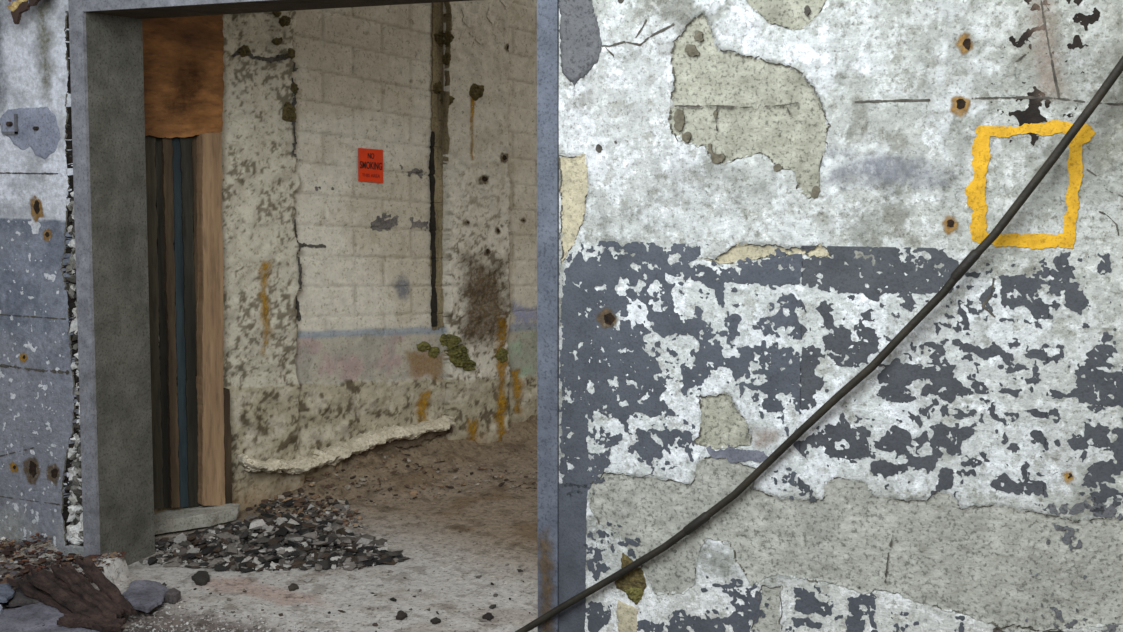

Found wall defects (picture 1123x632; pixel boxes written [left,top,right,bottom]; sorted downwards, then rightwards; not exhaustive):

spalling [747,0,826,30]
crack [600,19,674,60]
rust [956,33,973,53]
spalling [668,13,831,199]
rust [951,96,970,117]
rust [943,216,958,234]
spalling [0,11,84,548]
damp [463,259,537,344]
rust [417,391,430,419]
rust [496,319,522,441]
peeling [558,141,1123,632]
rust [10,458,59,485]